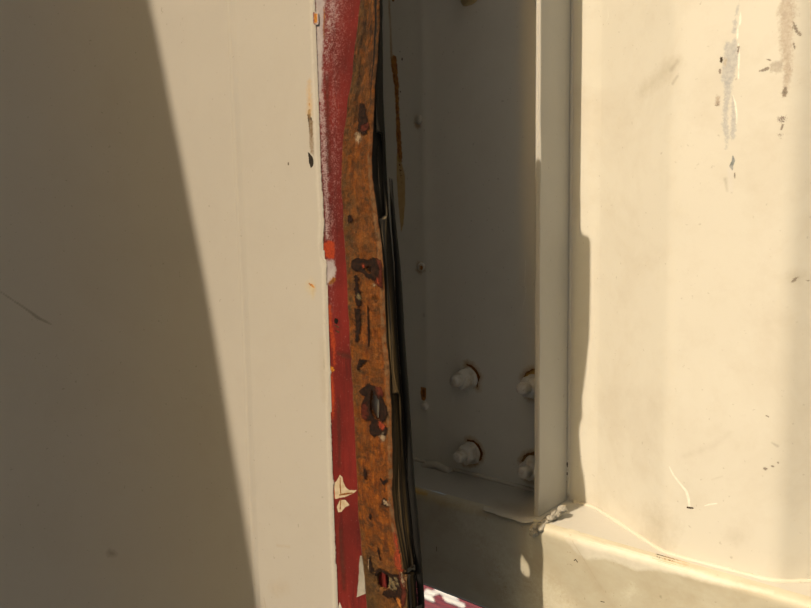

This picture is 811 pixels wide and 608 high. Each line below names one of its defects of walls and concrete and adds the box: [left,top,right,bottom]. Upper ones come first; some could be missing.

corrosion [354,103,369,144]
corrosion [386,0,406,233]
peeling [717,0,743,196]
spalling [772,113,790,141]
peeling [303,0,383,608]
corrosion [516,361,535,384]
corrosion [515,444,534,488]